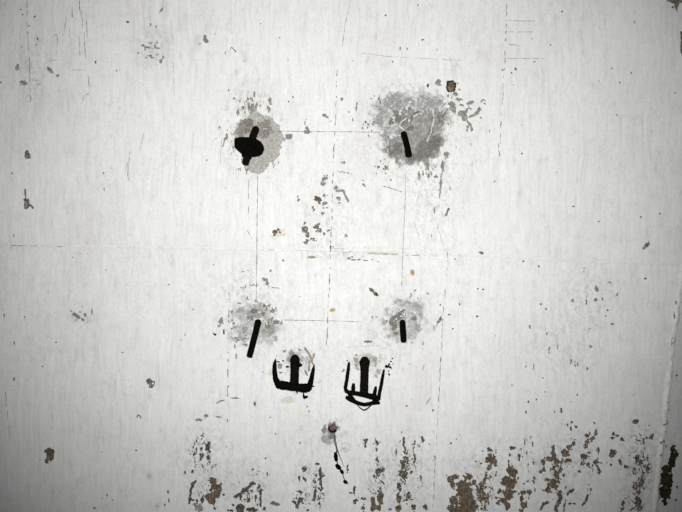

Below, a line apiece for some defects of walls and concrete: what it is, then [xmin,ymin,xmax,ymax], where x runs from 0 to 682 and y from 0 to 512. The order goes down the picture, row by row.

peeling [184,433,225,512]
peeling [227,467,280,512]
peeling [292,463,325,511]
spalling [322,422,340,444]
peeling [349,432,428,512]
peeling [446,419,654,512]
peeling [659,440,679,506]